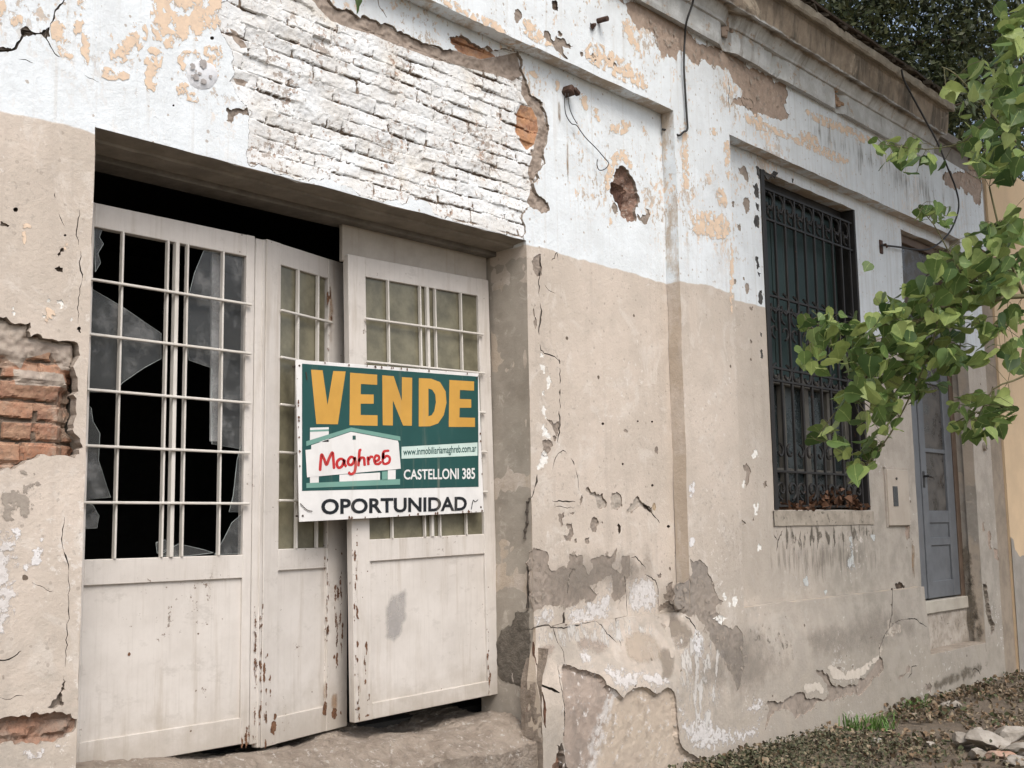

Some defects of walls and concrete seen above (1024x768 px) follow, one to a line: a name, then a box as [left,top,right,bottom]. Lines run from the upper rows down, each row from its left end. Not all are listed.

crack [0,0,64,63]
flaking render [102,0,550,240]
peeling [514,0,871,164]
flaking render [0,307,82,521]
flaking render [0,679,77,745]
crack [32,517,70,663]
rust [241,604,277,748]
rust [322,557,359,719]
rust [354,641,370,721]
crack [524,556,659,736]
leakage [786,525,873,550]
crack [879,588,927,653]